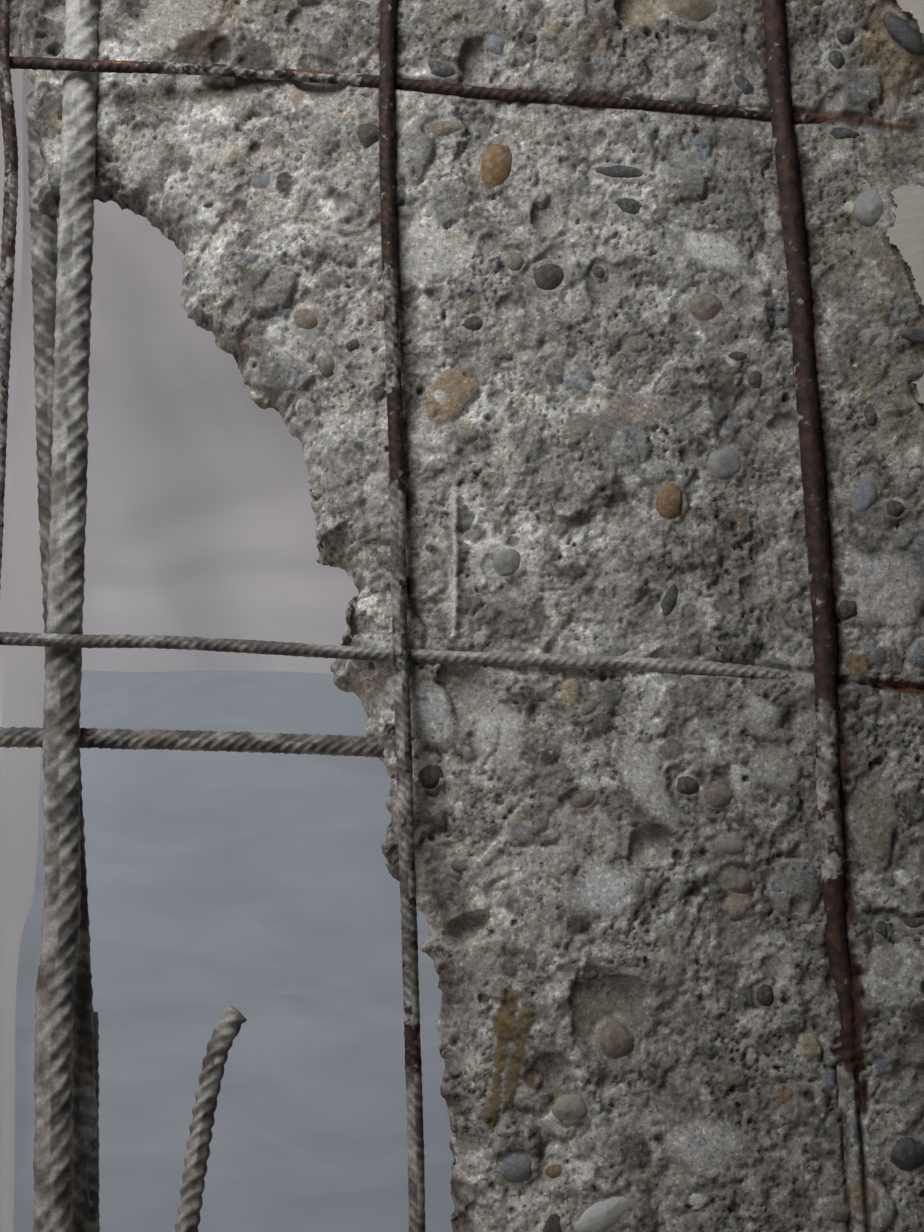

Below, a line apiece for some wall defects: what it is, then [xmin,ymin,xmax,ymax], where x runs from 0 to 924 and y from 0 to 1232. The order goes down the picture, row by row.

spalling [9,0,66,218]
spalling [94,0,400,882]
spalling [394,0,924,1232]
corrosion [818,391,869,1113]
corrosion [791,104,915,129]
corrosion [871,679,924,693]